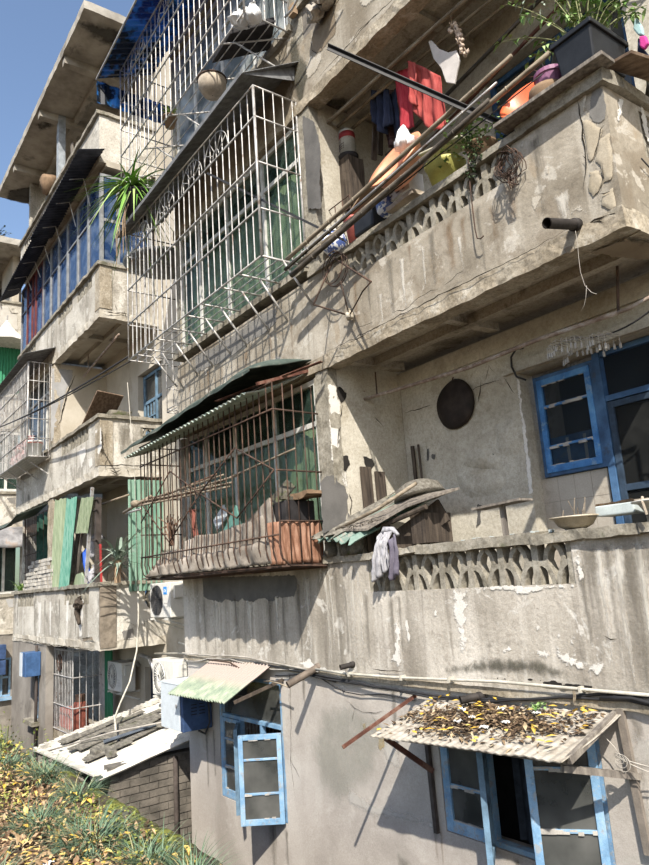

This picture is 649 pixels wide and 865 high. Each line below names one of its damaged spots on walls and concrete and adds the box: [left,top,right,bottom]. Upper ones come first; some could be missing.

peeling [306,0,338,78]
crack [577,100,615,223]
peeling [328,384,350,486]
peeling [484,555,584,594]
peeling [391,620,410,666]
peeling [453,590,468,653]
peeling [537,634,604,675]